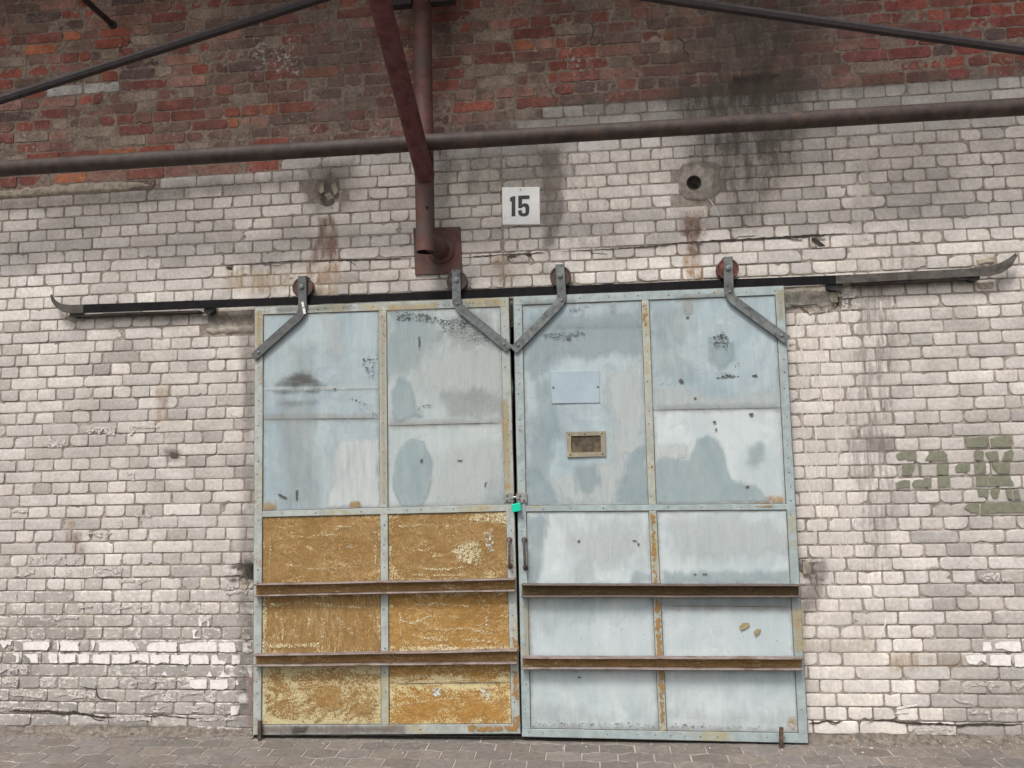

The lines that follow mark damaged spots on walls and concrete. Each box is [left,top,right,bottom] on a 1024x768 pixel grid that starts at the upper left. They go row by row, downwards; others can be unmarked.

water stain [248,34,300,80]
corrosion [308,218,337,294]
corrosion [683,210,707,279]
peeling [15,555,151,587]
peeling [928,563,1014,596]
peeling [0,605,252,730]
peeling [965,627,1024,667]
peeling [914,726,956,735]